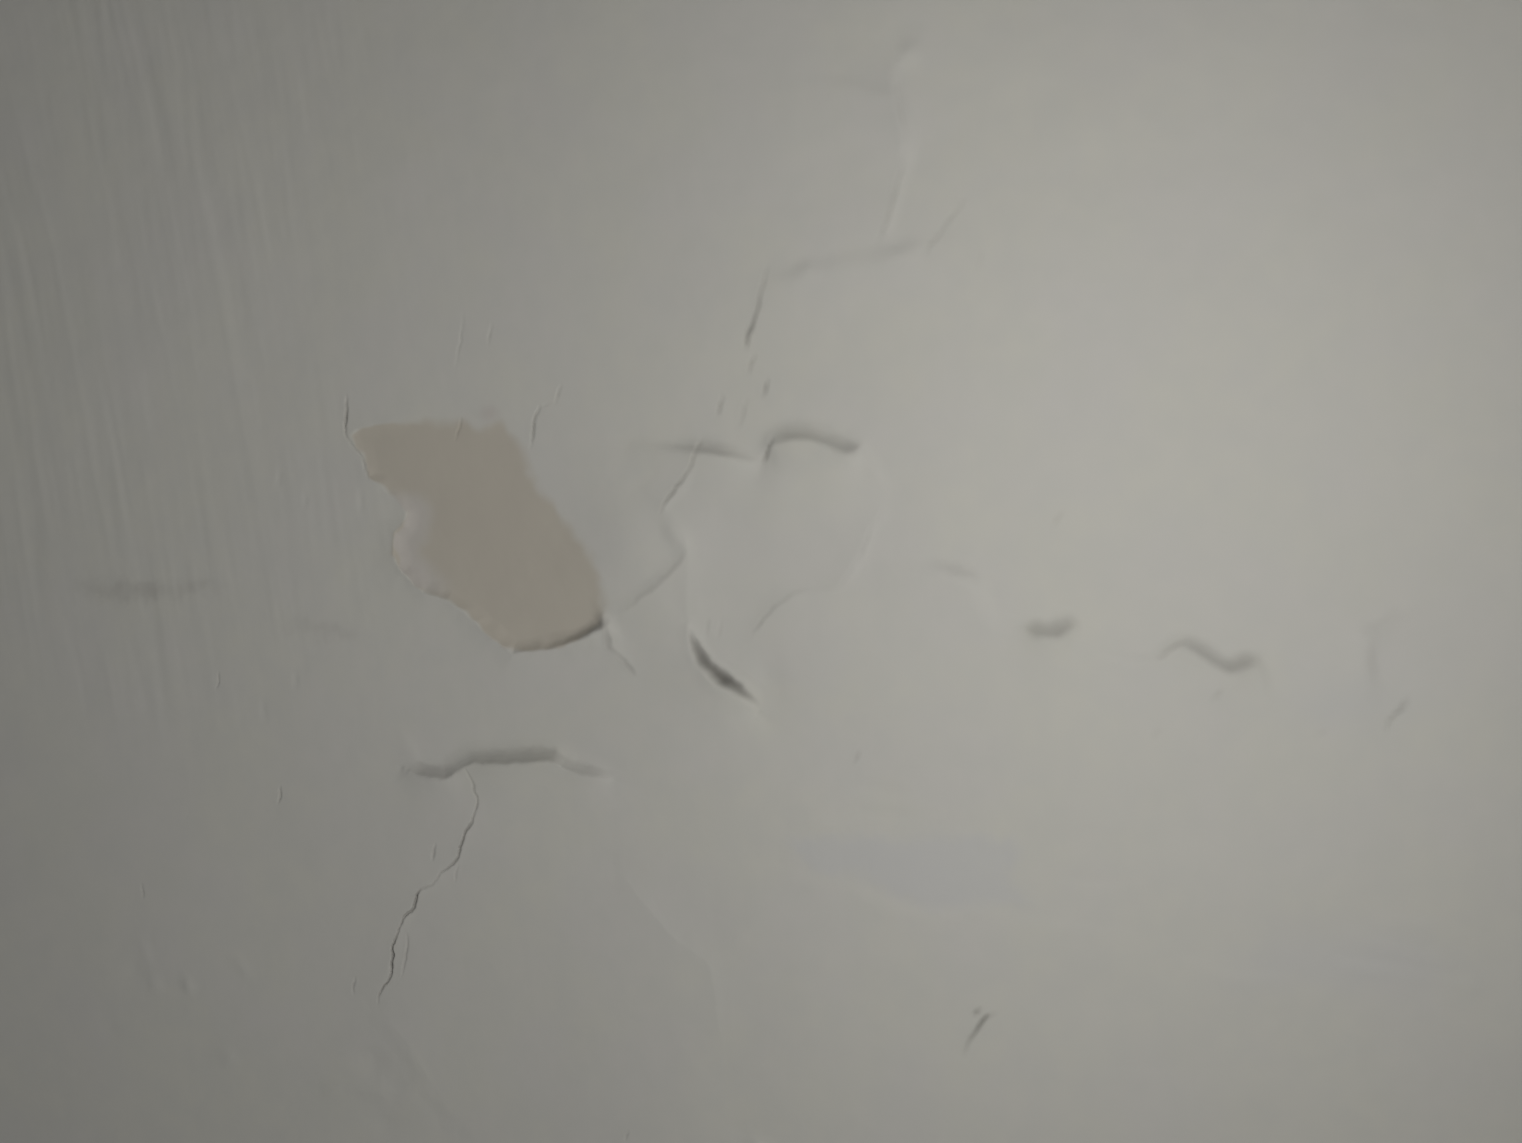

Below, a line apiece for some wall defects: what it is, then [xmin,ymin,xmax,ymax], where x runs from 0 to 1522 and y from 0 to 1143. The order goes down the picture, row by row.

peeling [339,386,617,666]
crack [371,762,483,1010]